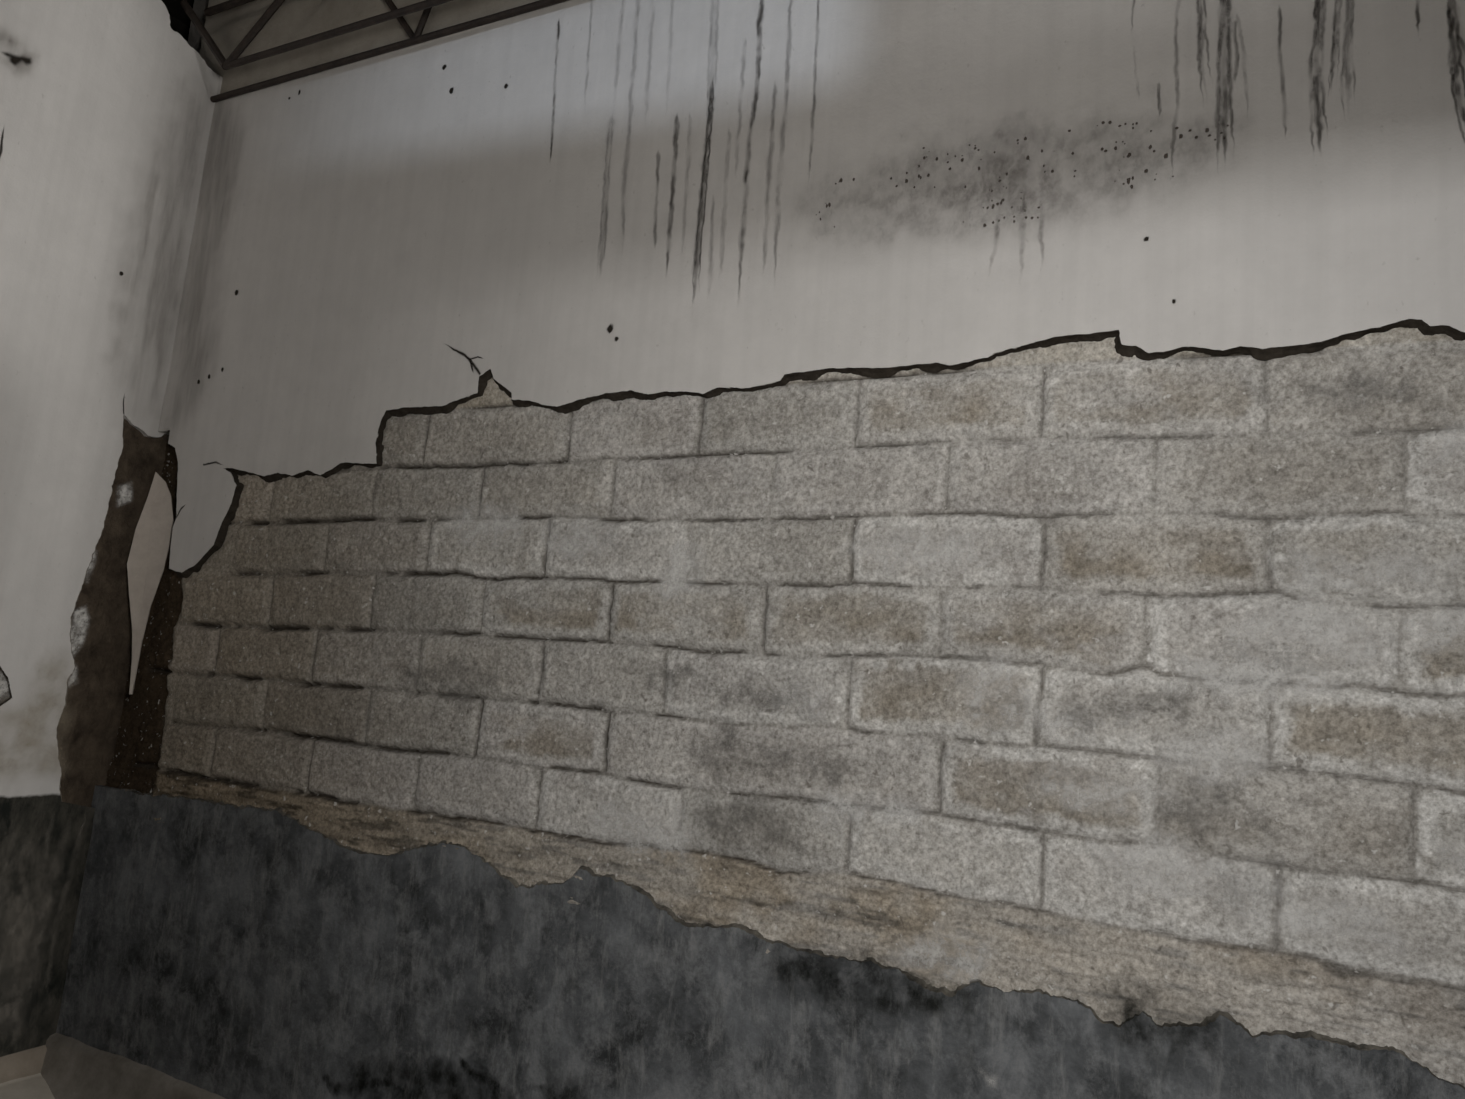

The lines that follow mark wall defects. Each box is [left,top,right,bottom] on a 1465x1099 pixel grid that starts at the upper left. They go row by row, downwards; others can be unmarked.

damp [1448,10,1465,137]
damp [695,90,712,266]
damp [890,144,995,188]
damp [1097,121,1174,189]
spalling [0,666,12,706]
spalling [56,319,1465,1090]
damp [870,972,943,1013]
damp [1123,998,1211,1043]
damp [324,1059,497,1099]